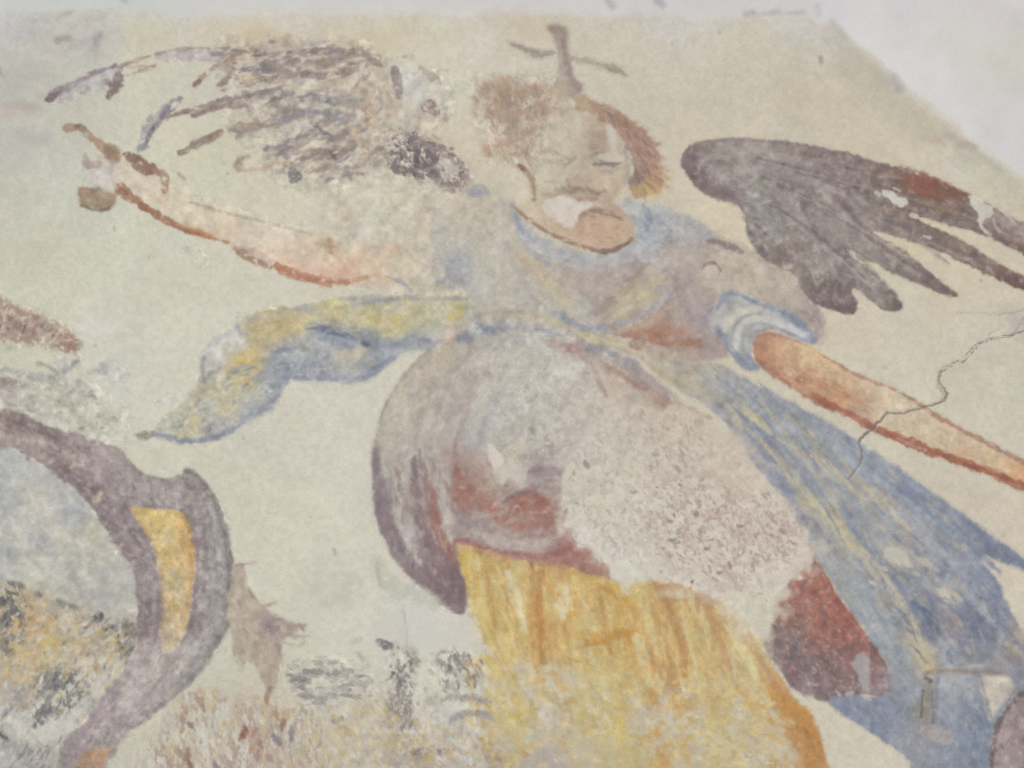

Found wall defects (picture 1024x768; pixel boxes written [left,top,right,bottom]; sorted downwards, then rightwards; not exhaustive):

crack [847,312,1014,481]